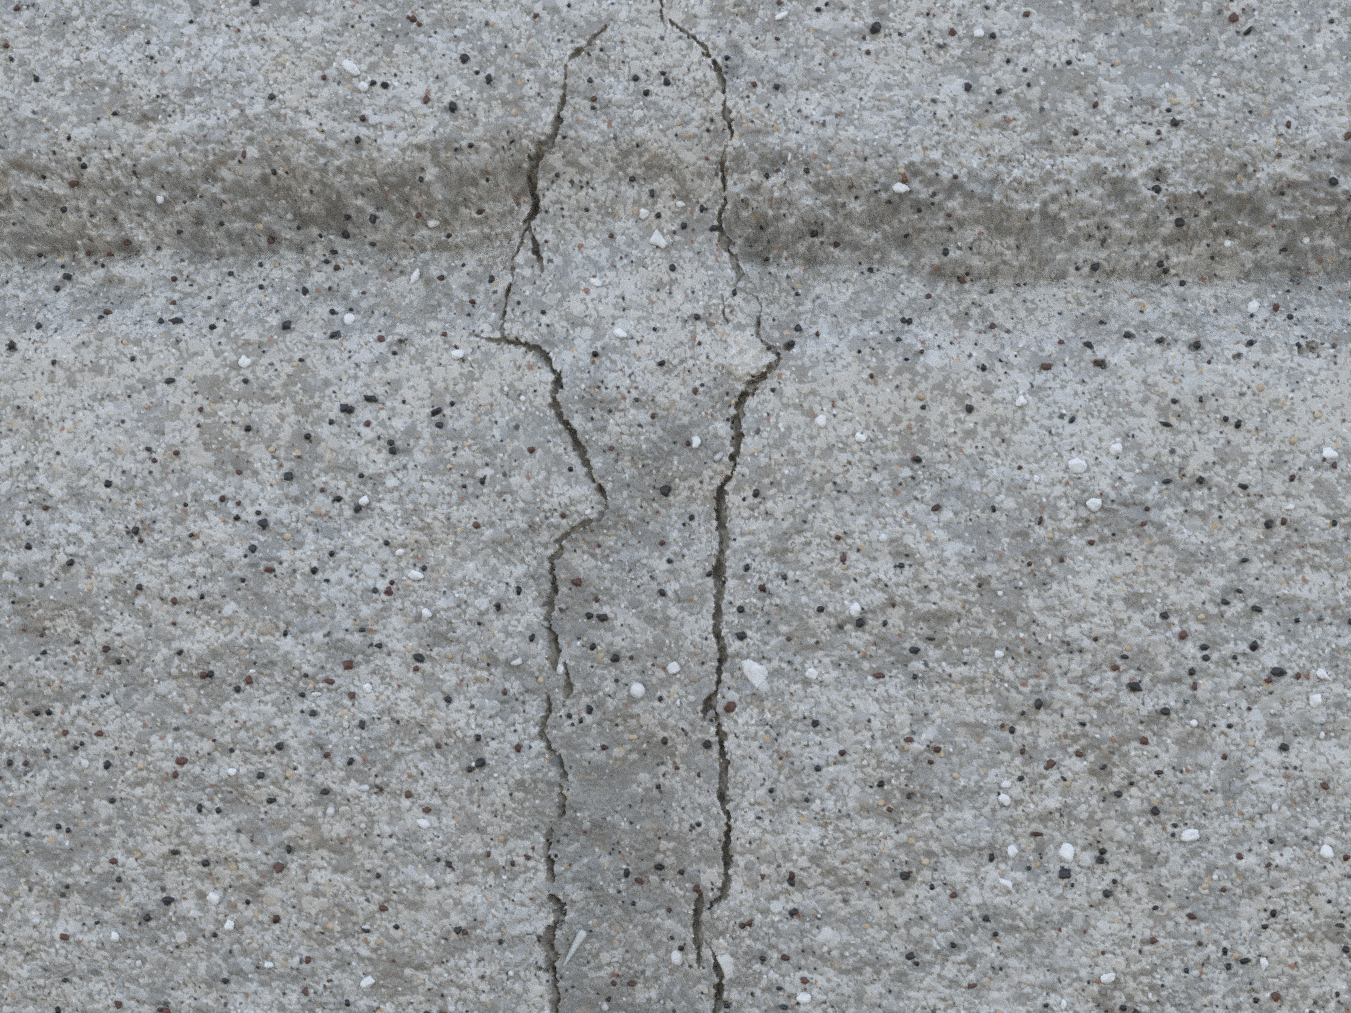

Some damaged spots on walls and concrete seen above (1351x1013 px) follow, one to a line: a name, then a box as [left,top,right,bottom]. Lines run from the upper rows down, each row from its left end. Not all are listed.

crack [470,23,610,1013]
crack [659,0,795,1013]